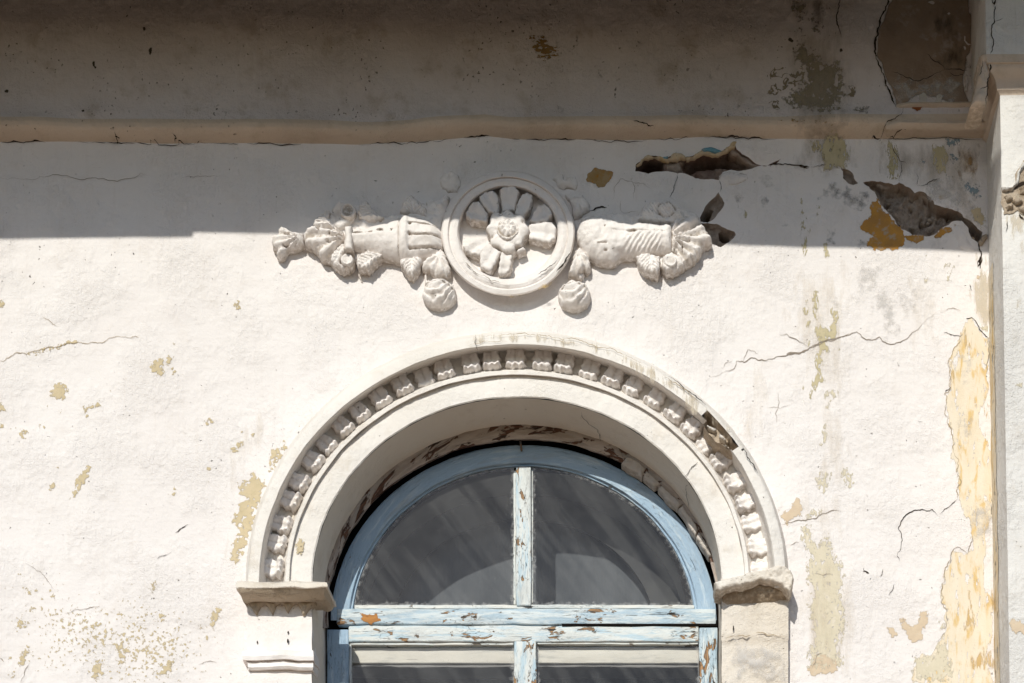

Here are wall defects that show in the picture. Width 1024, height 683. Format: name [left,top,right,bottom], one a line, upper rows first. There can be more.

crack [84,134,300,146]
flaking render [635,141,779,247]
leakage [767,0,869,118]
flaking render [841,169,987,251]
crack [872,0,1001,186]
crack [4,317,137,361]
peeling [803,290,840,409]
crack [666,308,989,402]
peeling [230,440,287,564]
crack [863,501,955,593]
peeling [911,318,994,683]
peeling [8,566,222,682]